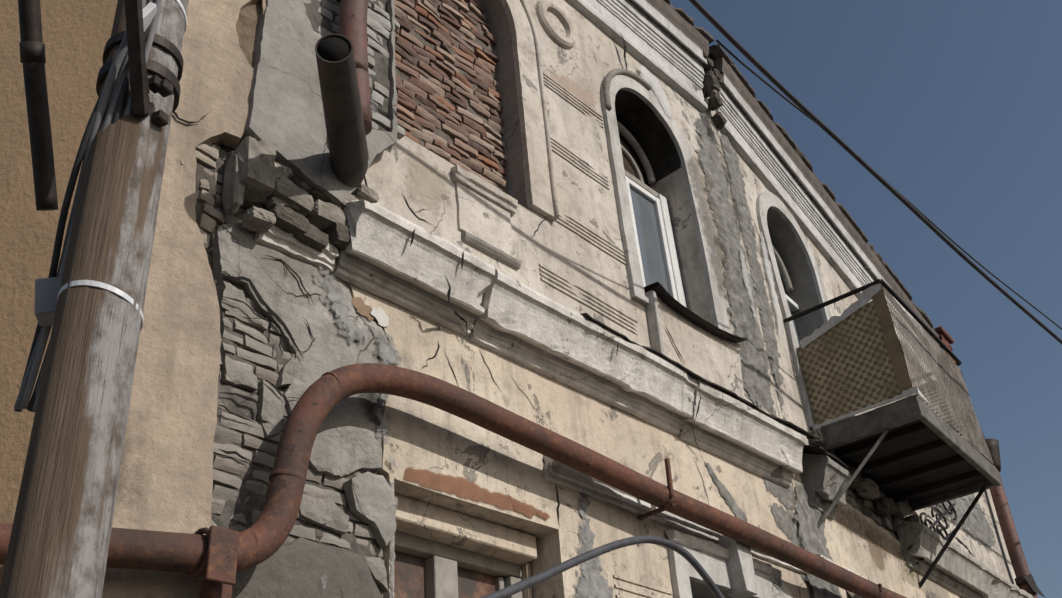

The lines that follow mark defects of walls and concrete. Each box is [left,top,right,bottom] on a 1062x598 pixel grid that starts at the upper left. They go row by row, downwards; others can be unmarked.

crack [174,111,209,124]
flaking render [236,1,261,68]
flaking render [303,0,341,40]
flaking render [367,0,405,140]
crack [212,225,316,423]
flaking render [181,142,389,533]
crack [422,341,459,386]
crack [444,251,535,408]
crack [219,449,254,464]
flaking render [231,393,398,598]
crack [692,387,709,502]
flaking render [808,428,961,598]